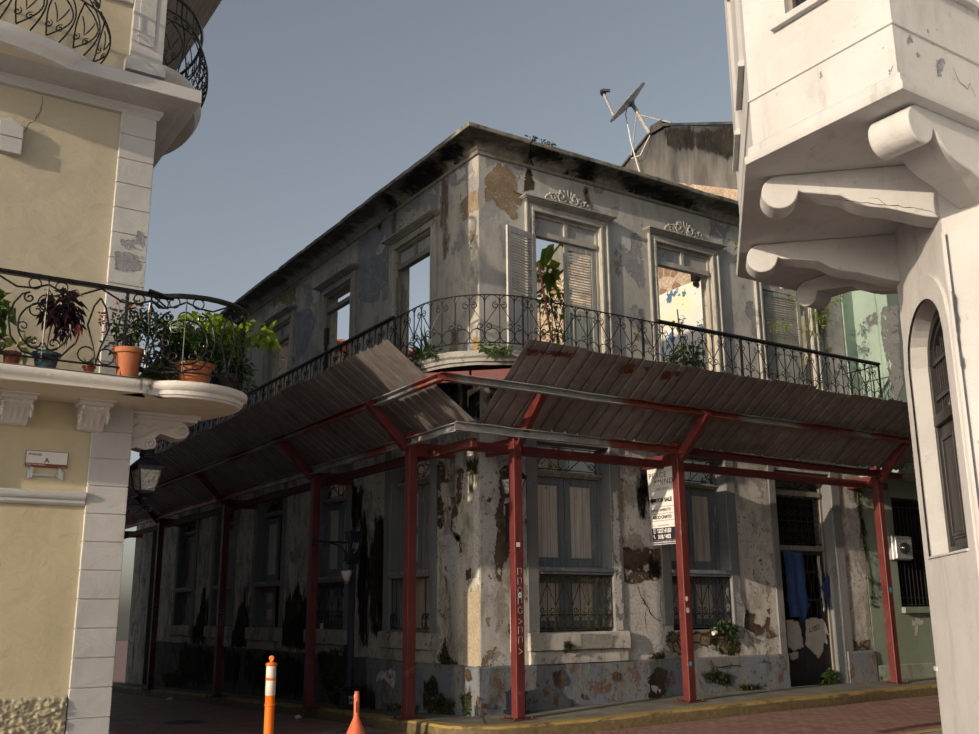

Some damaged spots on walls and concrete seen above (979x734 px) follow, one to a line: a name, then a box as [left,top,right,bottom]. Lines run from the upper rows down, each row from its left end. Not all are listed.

damp [376,139,464,259]
peeling [445,158,535,250]
damp [522,145,598,202]
mould [618,171,700,212]
damp [665,125,734,160]
crack [826,197,938,214]
peeling [866,304,904,400]
mould [351,481,384,646]
peeling [437,461,510,589]
peeling [613,492,681,656]
mould [179,583,307,700]
spalling [693,608,777,657]